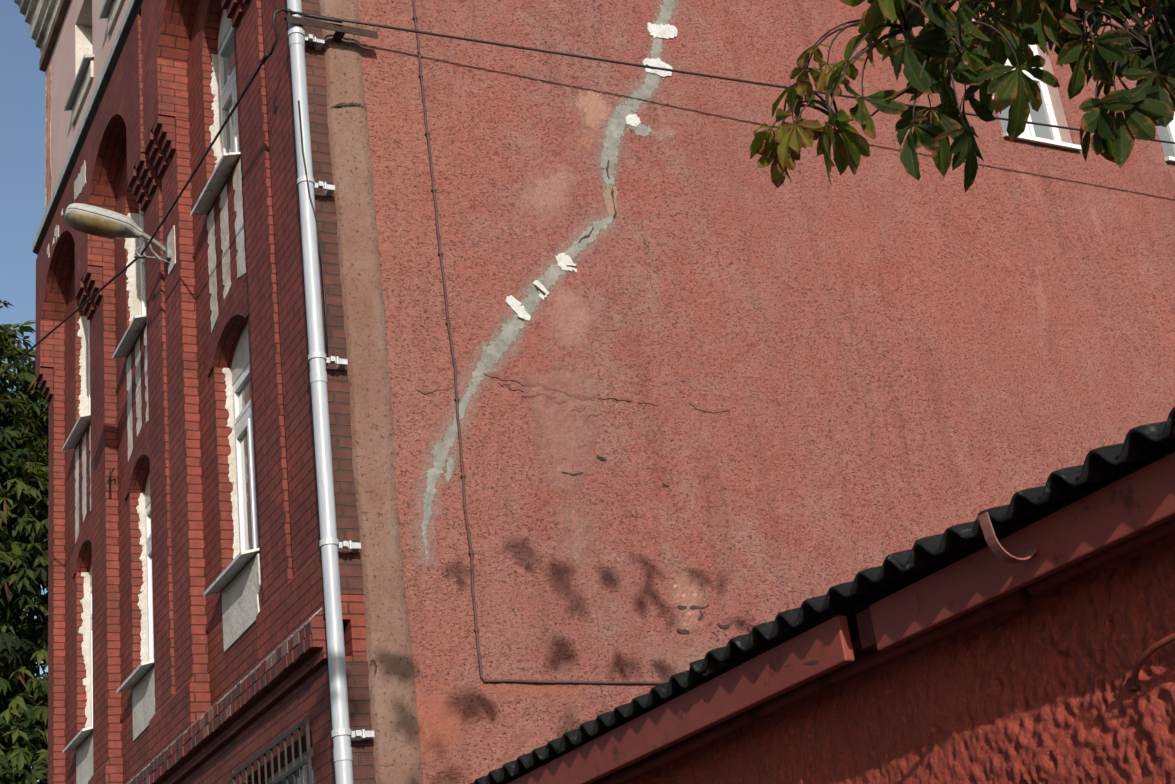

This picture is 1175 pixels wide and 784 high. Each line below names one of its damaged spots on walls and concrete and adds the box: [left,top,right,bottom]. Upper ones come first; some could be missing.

crack [414,0,681,565]